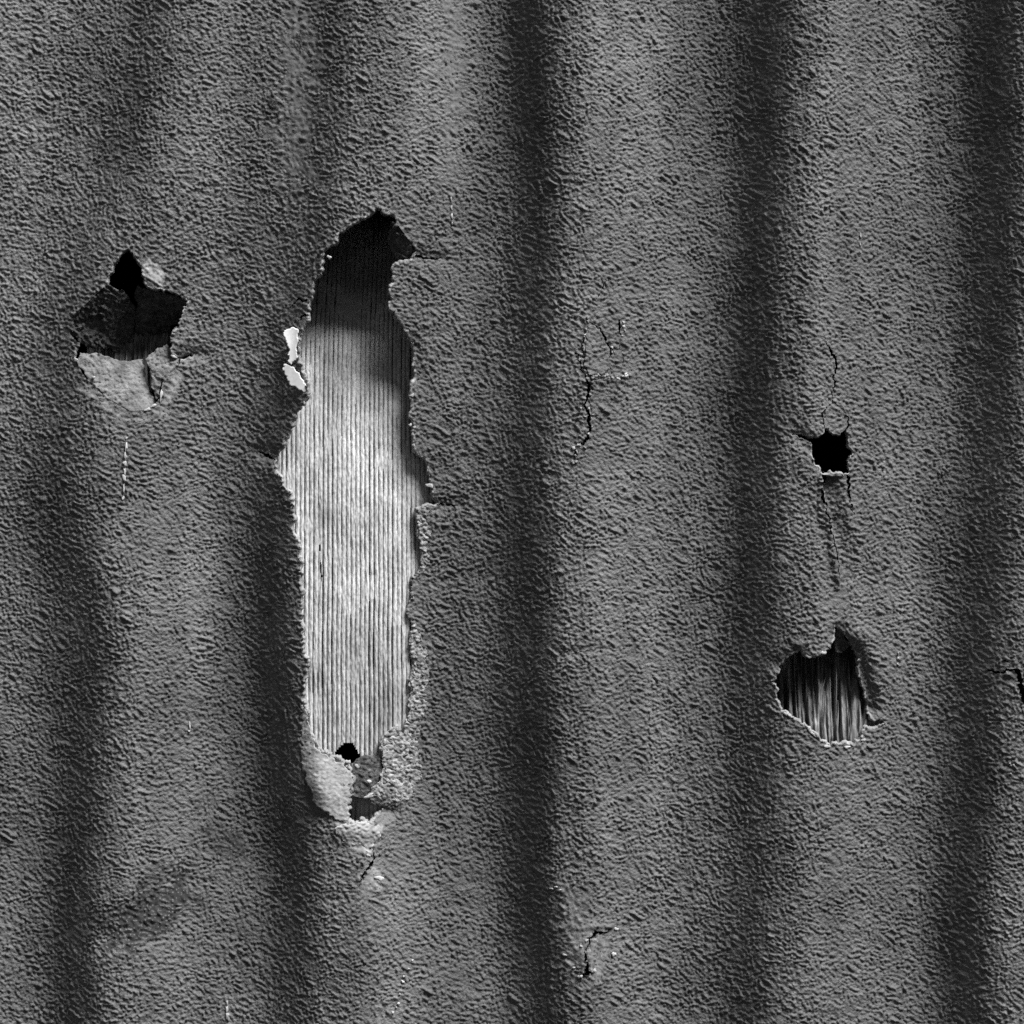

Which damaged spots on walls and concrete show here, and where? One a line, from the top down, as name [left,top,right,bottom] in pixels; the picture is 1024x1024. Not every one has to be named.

spalling [105,251,181,308]
spalling [71,335,95,379]
peeling [282,327,306,392]
crack [570,278,628,465]
crack [821,341,850,429]
spalling [798,430,851,486]
spalling [413,506,431,578]
crack [820,471,855,575]
spalling [364,629,429,807]
crack [985,660,1024,704]
spalling [300,703,381,856]
crack [563,927,619,979]